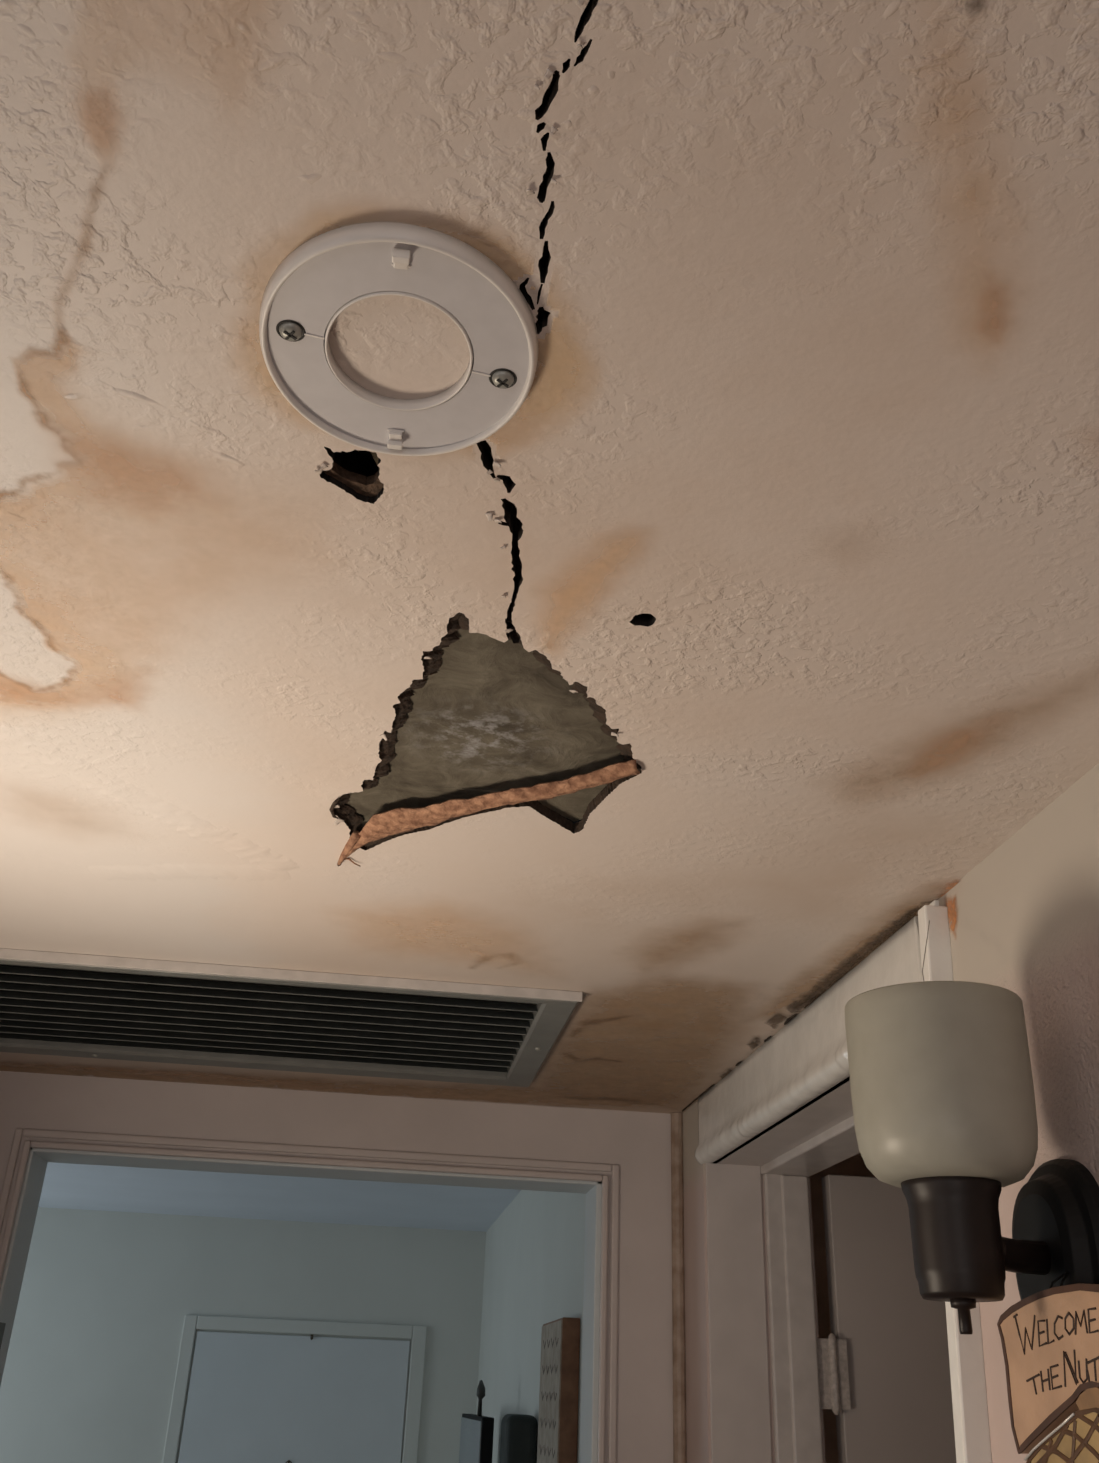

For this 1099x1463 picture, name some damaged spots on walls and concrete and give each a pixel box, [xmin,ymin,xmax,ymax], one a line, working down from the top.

crack [519,0,598,334]
spalling [314,447,384,504]
crack [476,440,523,643]
spalling [329,612,642,867]